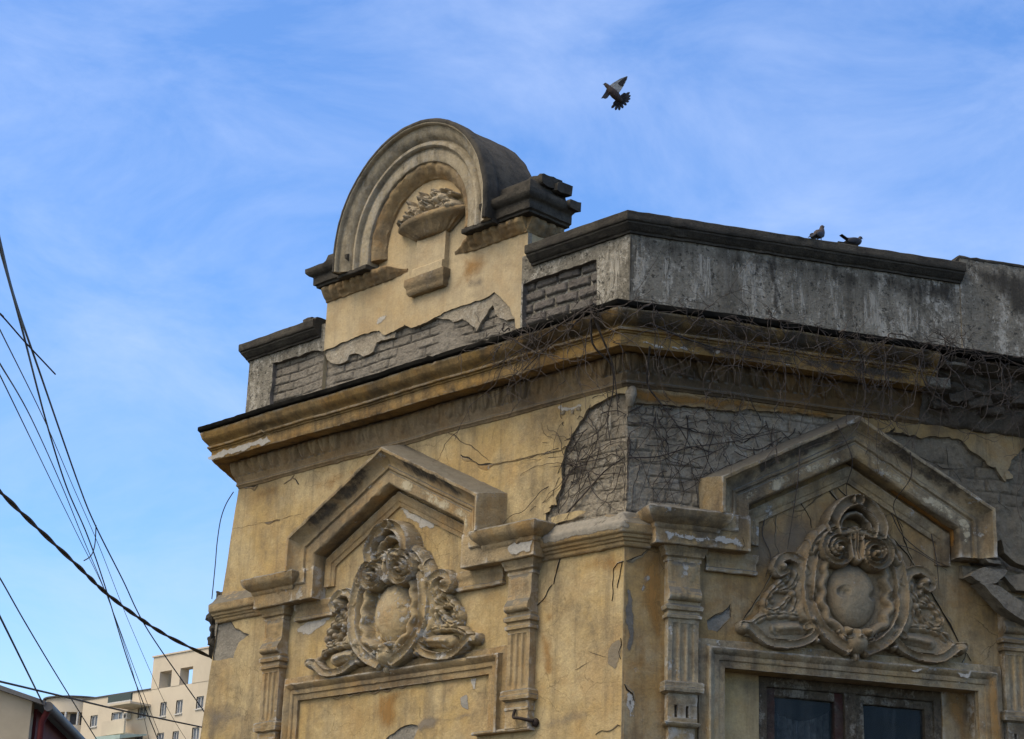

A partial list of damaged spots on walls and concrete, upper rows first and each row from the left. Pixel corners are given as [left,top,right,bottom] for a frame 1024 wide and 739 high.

water stain [984,270,1024,312]
flaking render [273,262,597,403]
peeling [208,437,270,460]
crack [447,428,561,471]
flaking render [508,386,832,555]
peeling [911,488,970,542]
crack [539,559,560,604]
flaking render [214,621,249,661]
peeling [608,576,650,668]